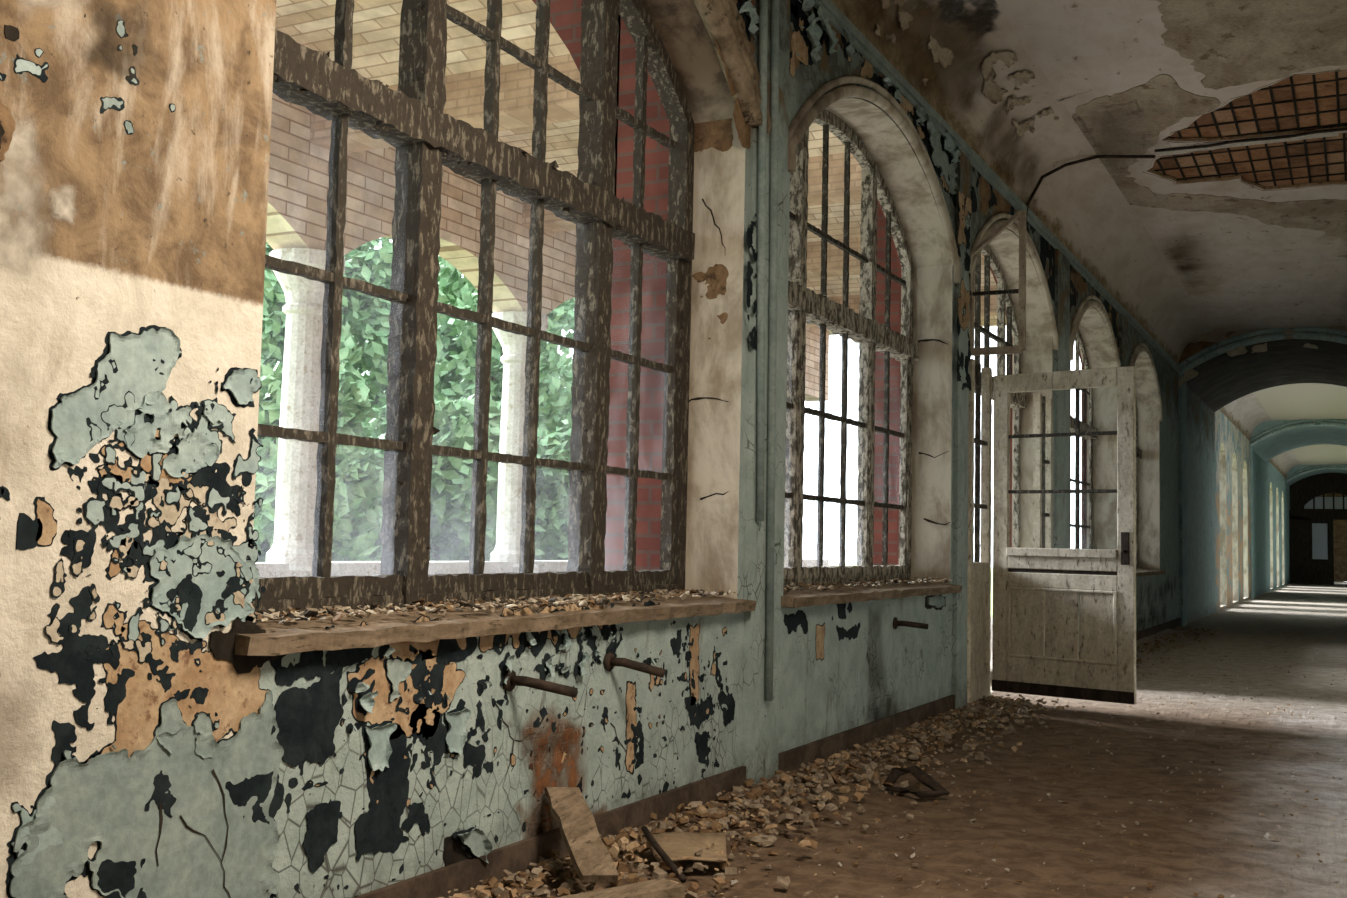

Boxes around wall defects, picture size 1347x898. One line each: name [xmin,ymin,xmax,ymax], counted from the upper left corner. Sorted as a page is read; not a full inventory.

peeling [0,25,49,83]
peeling [116,20,140,86]
damp [859,0,999,107]
flaking render [0,100,15,162]
peeling [100,96,134,135]
peeling [981,0,1347,258]
damp [0,125,38,271]
damp [52,188,74,221]
peeling [692,264,729,299]
peeling [746,214,757,351]
peeling [0,325,736,898]
peeling [783,577,952,661]